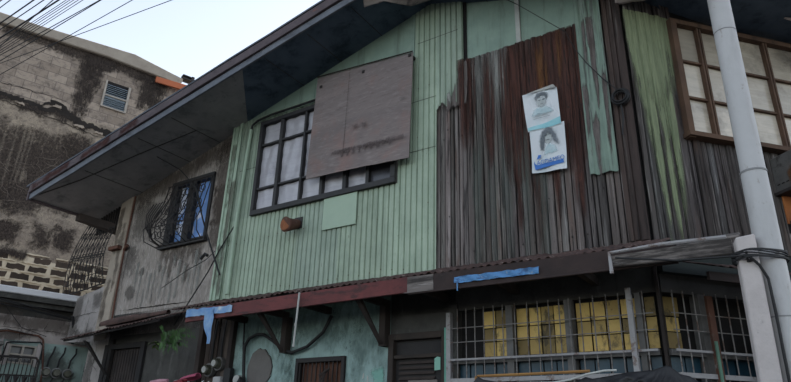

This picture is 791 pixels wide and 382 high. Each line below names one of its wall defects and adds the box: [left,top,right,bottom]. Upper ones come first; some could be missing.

flaking render [0,91,111,136]
leakage [3,26,170,117]
leakage [0,117,91,246]
leakage [30,221,74,252]